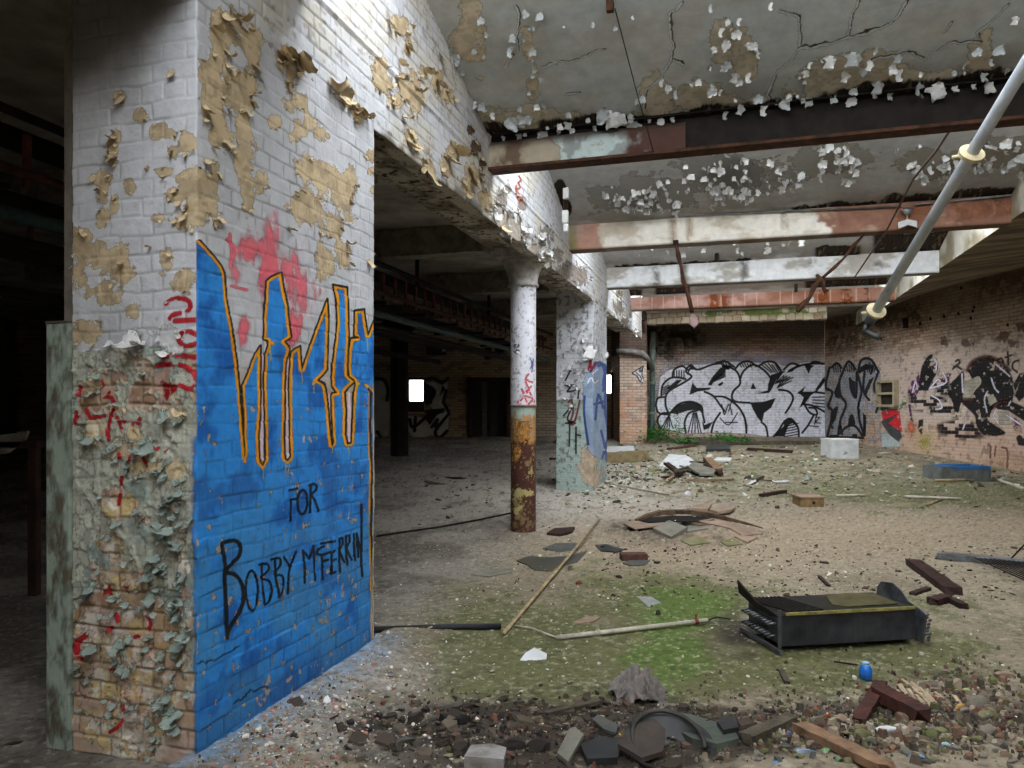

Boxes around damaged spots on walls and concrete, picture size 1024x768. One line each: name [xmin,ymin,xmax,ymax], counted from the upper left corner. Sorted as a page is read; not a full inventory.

crack [503,5,521,70]
crack [642,0,685,110]
crack [766,0,1009,100]
peeling [133,4,377,283]
peeling [369,0,1024,289]
corrosion [900,205,931,221]
peeling [559,290,642,411]
corrosion [709,294,729,309]
peeling [46,129,196,763]
corrosion [510,421,534,515]